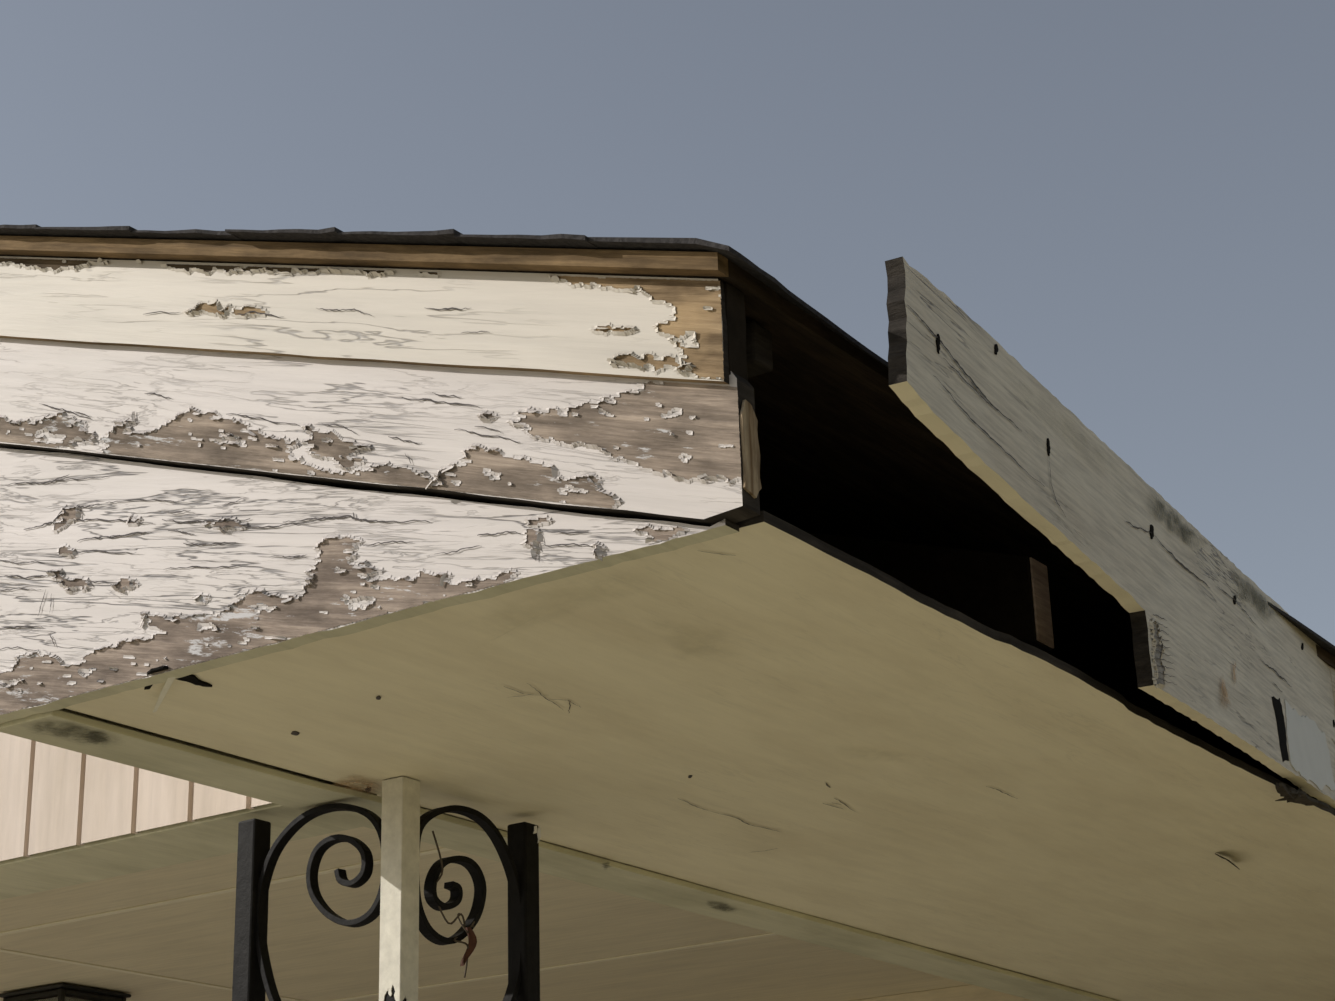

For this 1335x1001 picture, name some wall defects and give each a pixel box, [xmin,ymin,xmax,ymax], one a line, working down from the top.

peeling [0,258,109,274]
peeling [182,299,269,320]
peeling [158,264,397,279]
peeling [477,275,742,486]
peeling [0,406,624,561]
peeling [46,504,93,595]
peeling [633,523,689,543]
peeling [0,533,520,715]